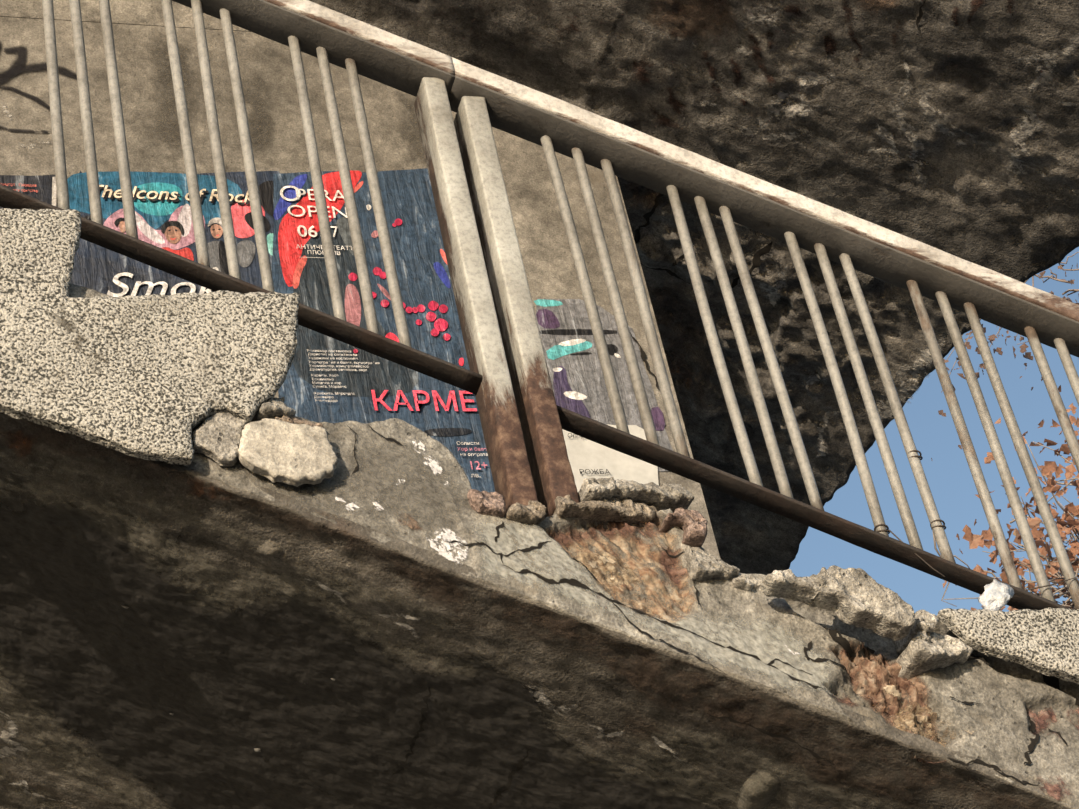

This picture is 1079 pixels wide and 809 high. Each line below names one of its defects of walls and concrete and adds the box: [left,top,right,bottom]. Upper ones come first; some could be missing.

crack [598,0,632,65]
peeling [428,528,468,563]
spalling [573,551,638,587]
rust [546,518,695,624]
water stain [0,441,889,809]
crack [447,521,875,702]
spalling [883,685,955,747]
crack [1043,674,1079,706]
crack [948,717,1067,785]